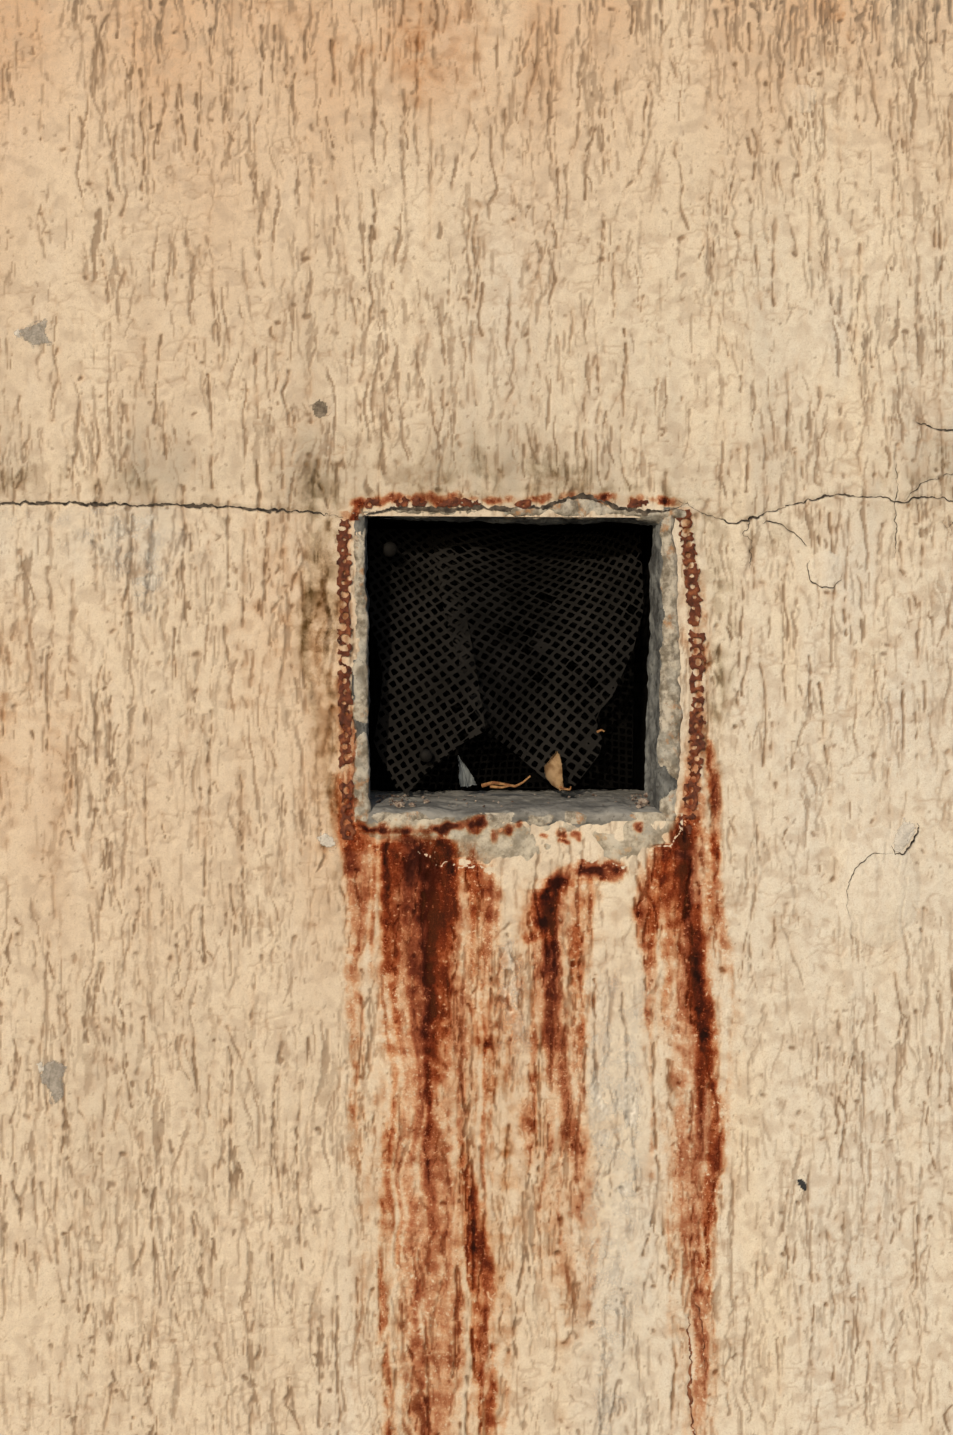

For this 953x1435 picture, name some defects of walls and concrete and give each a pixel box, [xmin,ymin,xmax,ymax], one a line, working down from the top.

peeling [14,319,50,345]
corrosion [350,494,454,520]
crack [0,459,953,568]
corrosion [528,859,624,1154]
corrosion [634,750,721,1268]
peeling [36,1061,67,1103]
corrosion [340,788,520,1435]